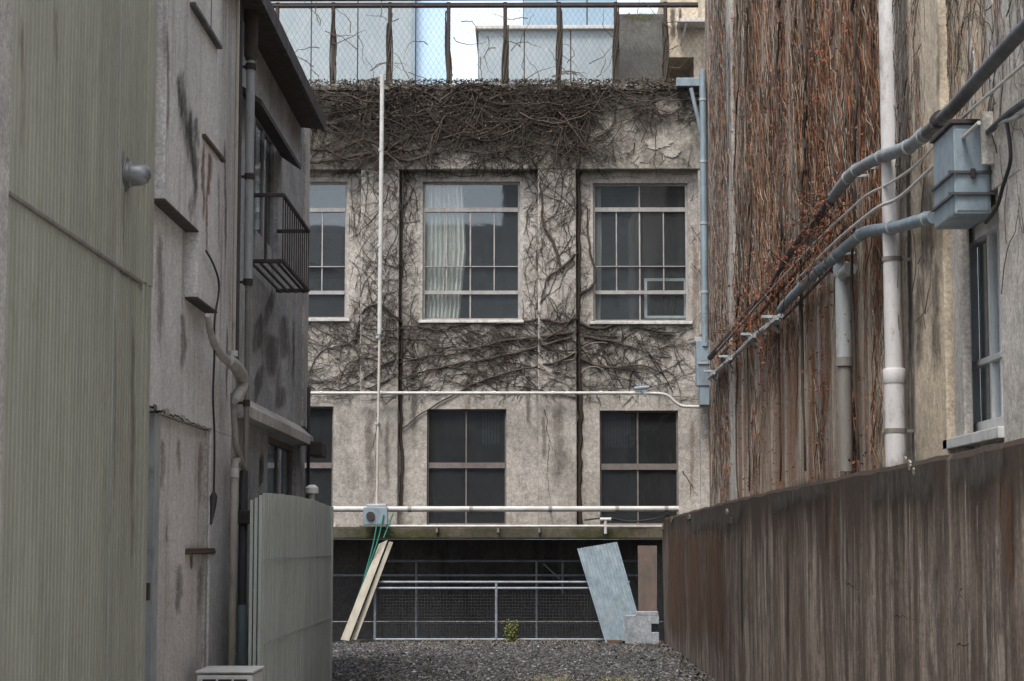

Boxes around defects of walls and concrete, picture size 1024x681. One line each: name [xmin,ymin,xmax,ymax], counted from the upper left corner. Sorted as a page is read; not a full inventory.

damp [178,80,198,190]
peeling [566,121,681,158]
rust [201,147,211,240]